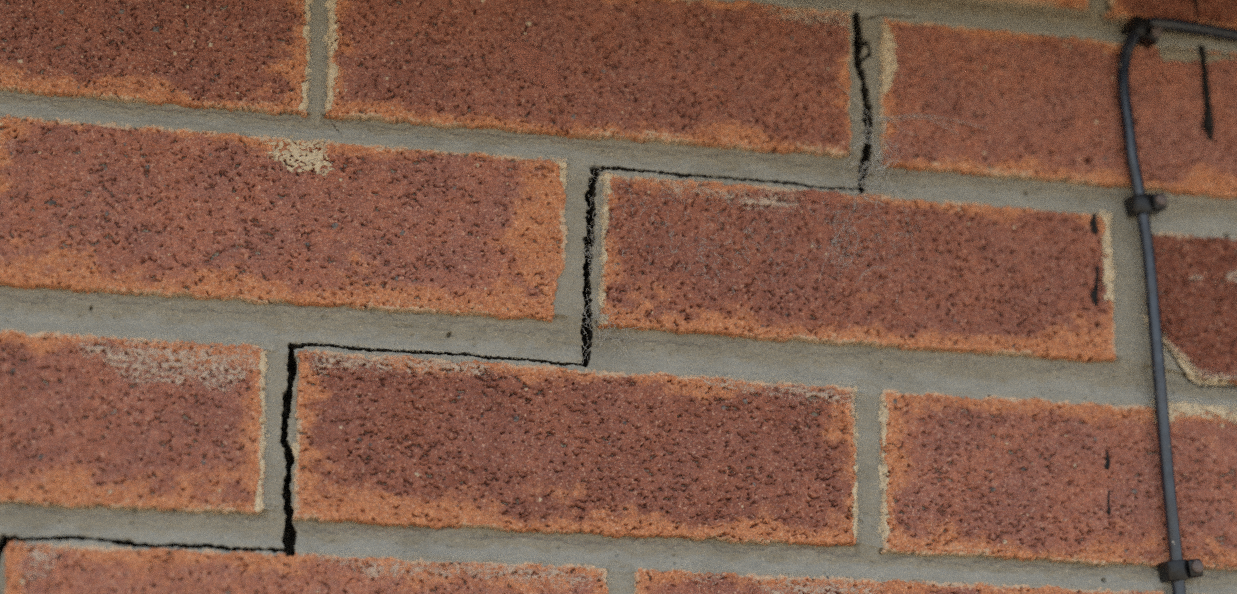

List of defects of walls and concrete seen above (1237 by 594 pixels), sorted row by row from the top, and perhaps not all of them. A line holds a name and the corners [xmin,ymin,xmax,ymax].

crack [0,12,916,557]
spalling [1162,337,1229,386]